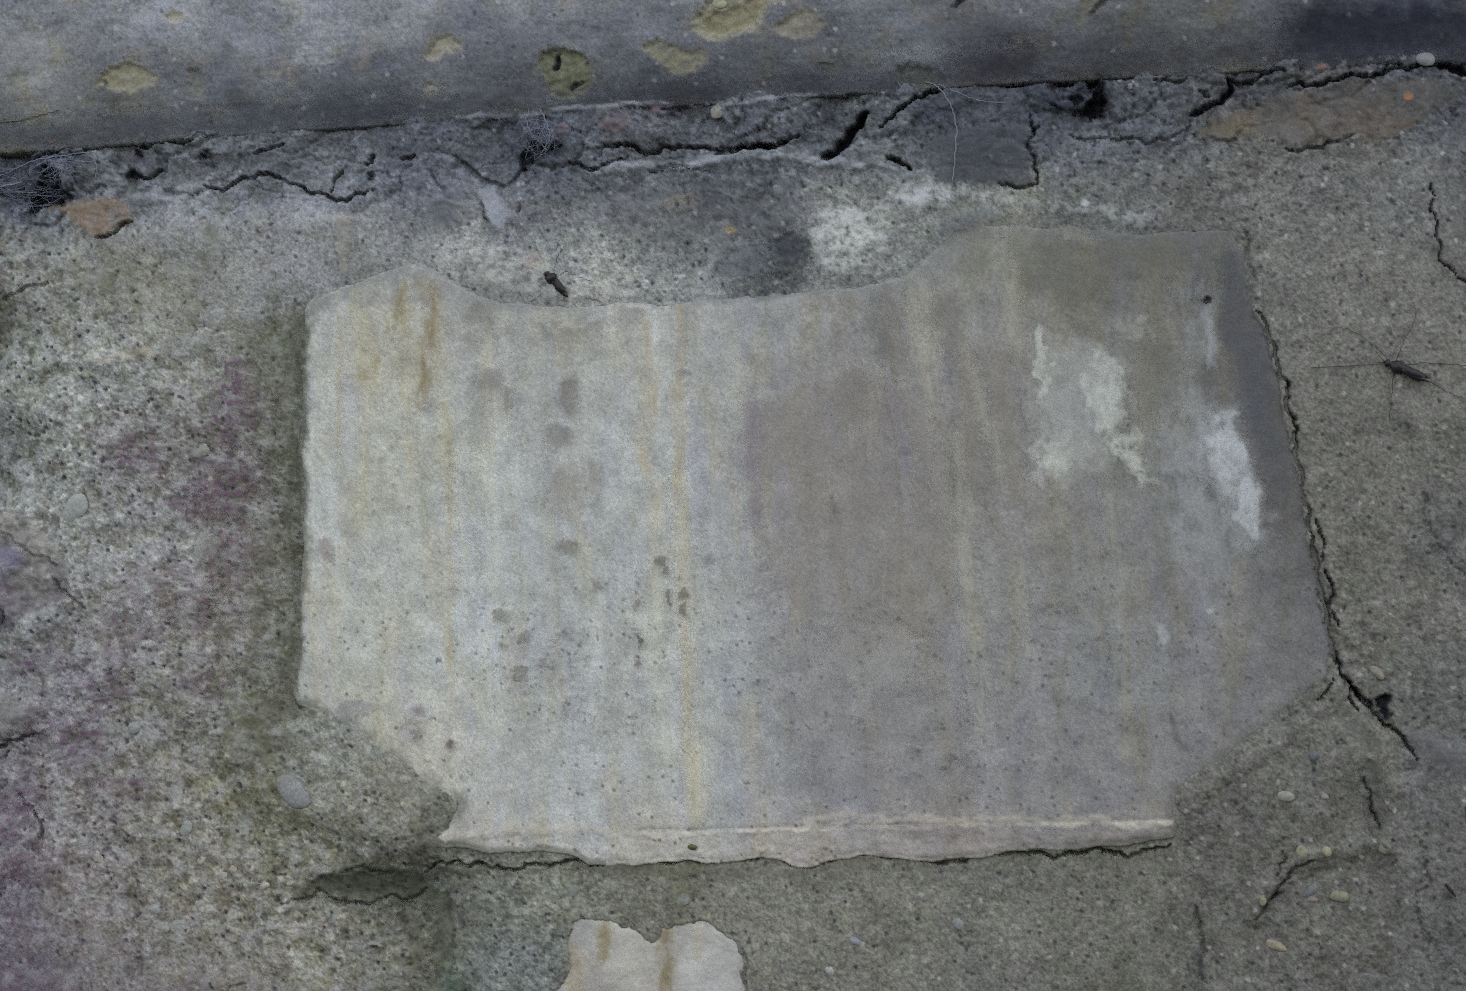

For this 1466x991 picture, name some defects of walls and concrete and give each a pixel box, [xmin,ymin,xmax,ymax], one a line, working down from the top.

spalling [93,60,158,94]
spalling [536,46,593,102]
spalling [642,0,825,75]
water stain [1287,0,1466,70]
crack [570,92,938,173]
crack [999,63,1466,190]
crack [208,143,416,203]
efflorescence [900,187,964,206]
efflorescence [812,207,880,271]
water stain [1023,237,1292,554]
crack [1262,317,1418,760]
peeling [557,912,747,991]